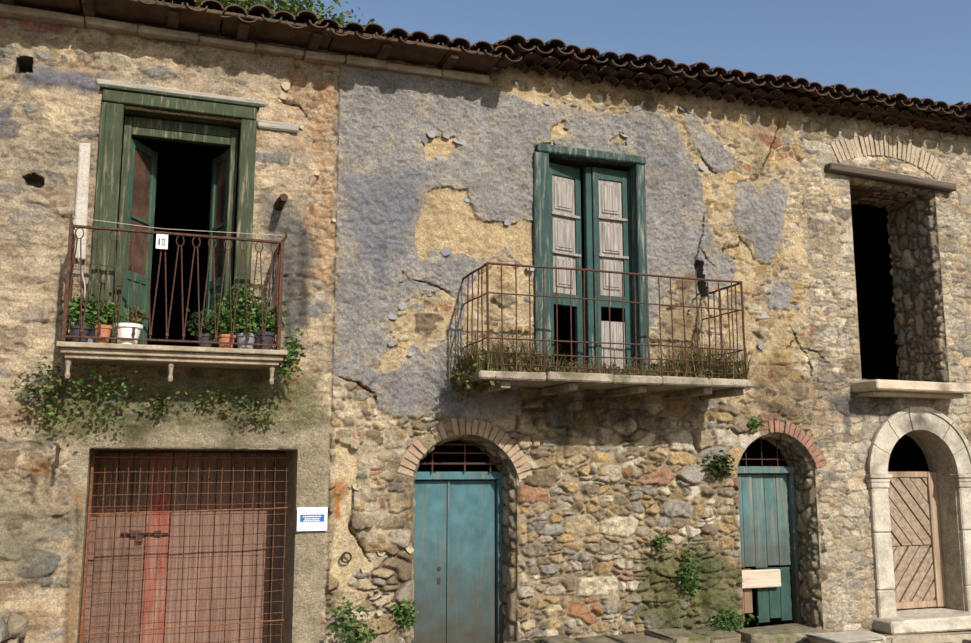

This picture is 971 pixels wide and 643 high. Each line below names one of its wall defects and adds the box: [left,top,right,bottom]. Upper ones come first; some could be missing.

spalling [422,130,465,160]
spalling [414,185,535,272]
spalling [489,78,782,367]
crack [694,216,715,266]